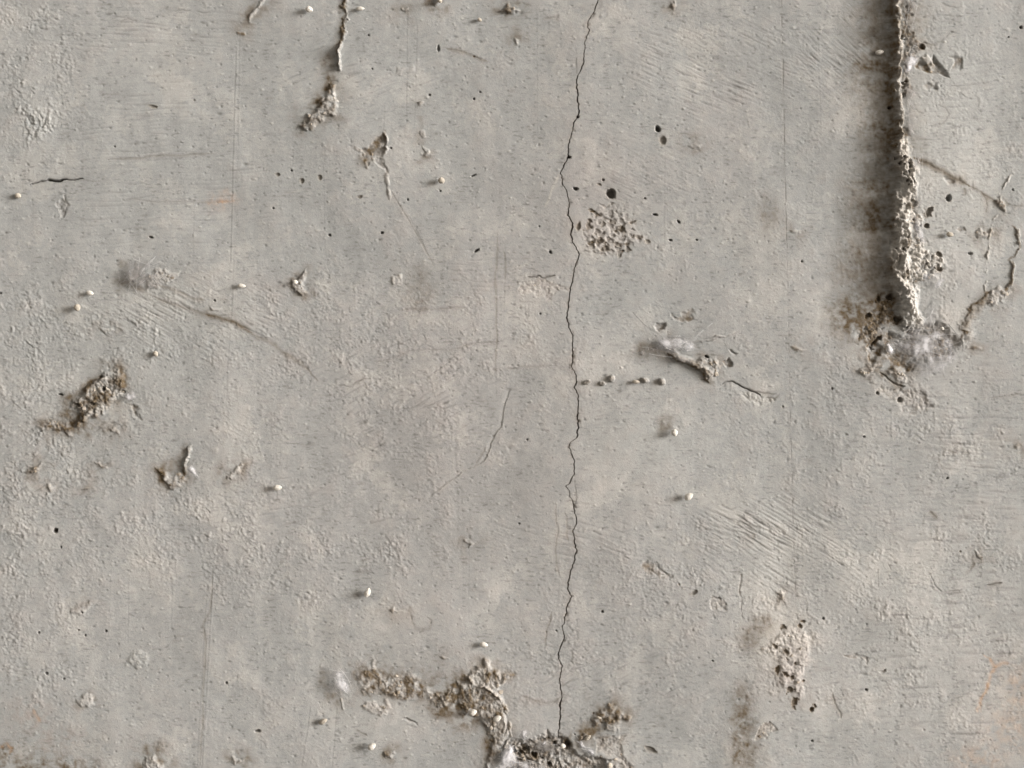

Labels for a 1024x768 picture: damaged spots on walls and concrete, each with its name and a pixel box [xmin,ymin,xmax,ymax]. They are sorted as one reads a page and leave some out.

spalling [898,0,965,99]
spalling [354,129,392,201]
spalling [894,155,946,288]
crack [339,1,598,739]
spalling [852,289,964,419]
spalling [495,727,638,768]